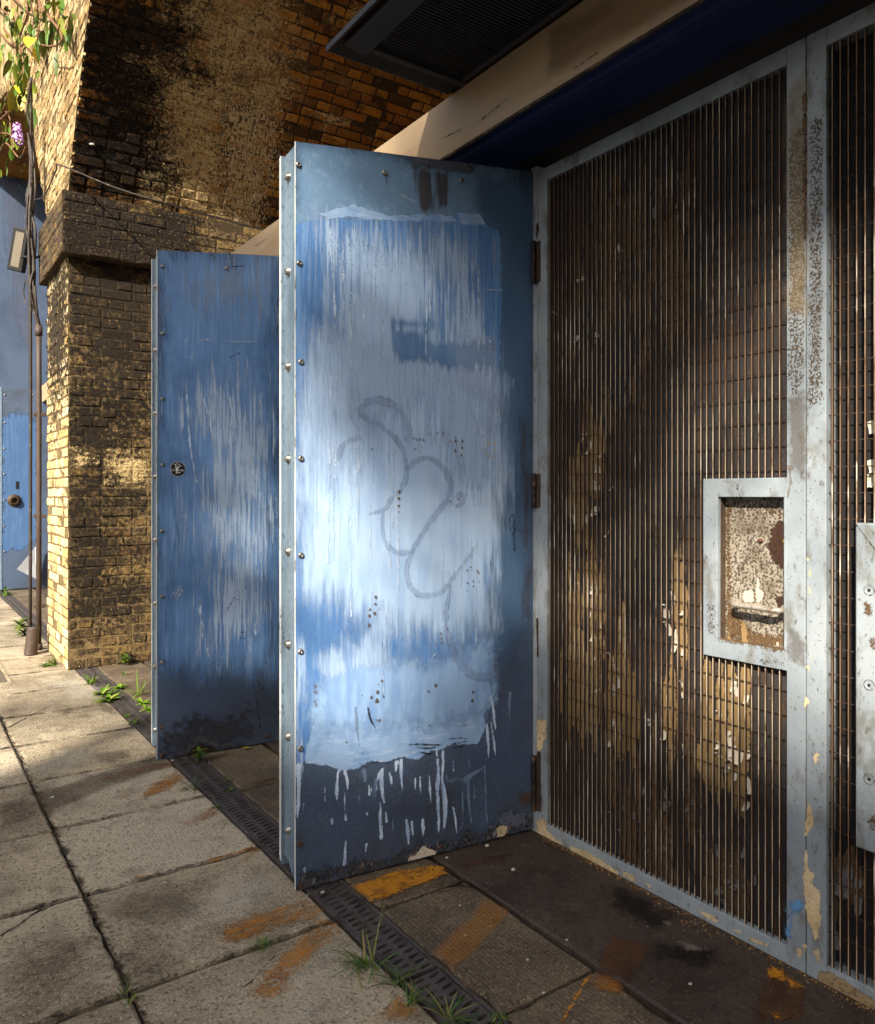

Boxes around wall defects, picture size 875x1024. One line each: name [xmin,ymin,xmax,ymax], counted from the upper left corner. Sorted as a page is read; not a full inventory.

water stain [139,0,315,228]
rust [718,497,784,652]
spalling [407,846,436,862]
peeling [804,803,814,836]
peeling [796,844,875,1010]